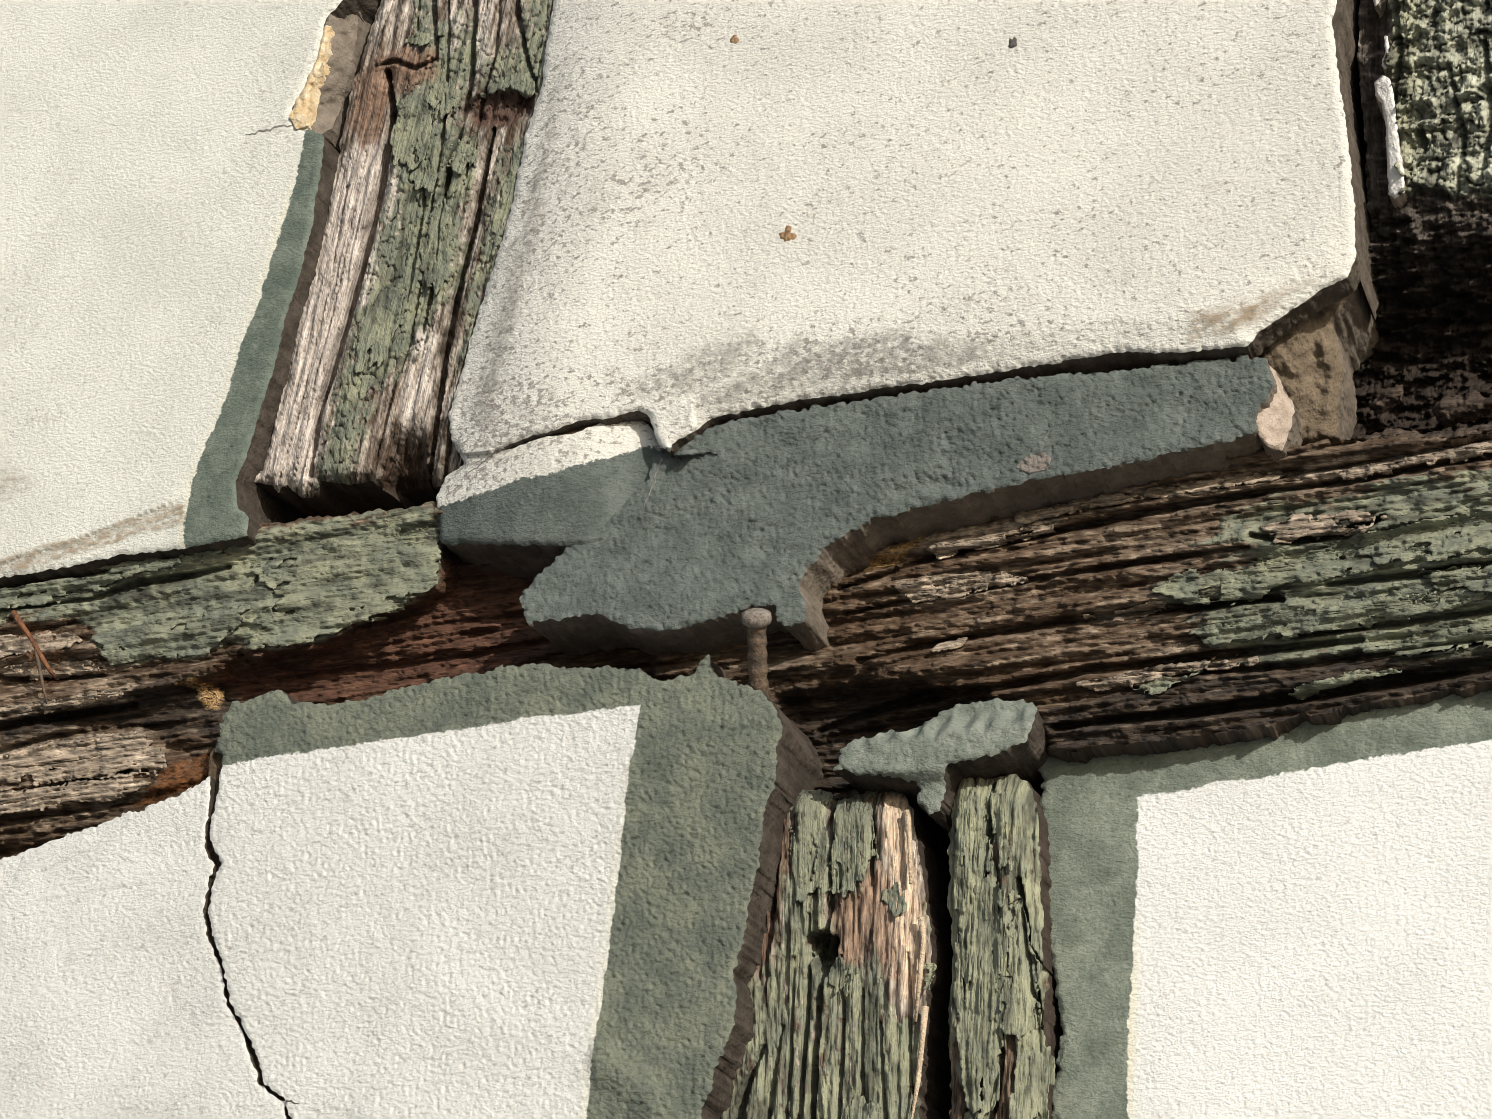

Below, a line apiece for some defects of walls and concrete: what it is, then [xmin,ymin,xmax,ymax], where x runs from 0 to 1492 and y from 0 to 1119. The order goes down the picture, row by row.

flaking render [289,12,371,154]
peeling [1373,0,1408,223]
crack [467,424,597,475]
crack [642,415,681,514]
flaking render [1256,366,1302,463]
peeling [0,550,222,609]
peeling [91,527,442,666]
peeling [1133,507,1492,700]
peeling [9,835,100,891]
peeling [789,793,879,903]
crack [208,748,299,1119]
peeling [952,787,1056,1119]